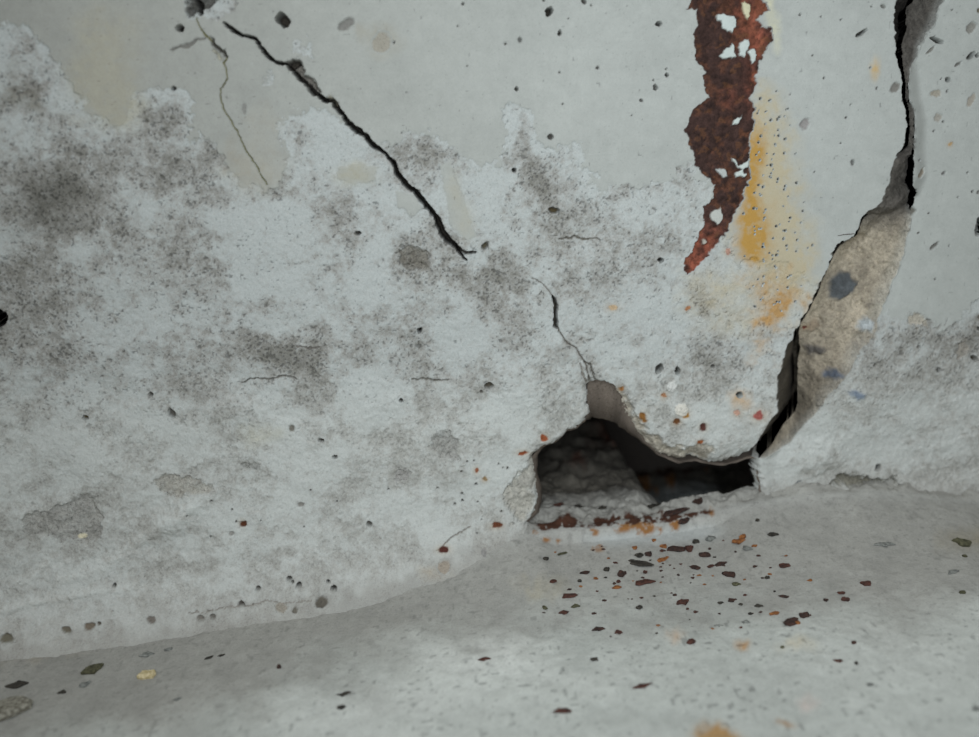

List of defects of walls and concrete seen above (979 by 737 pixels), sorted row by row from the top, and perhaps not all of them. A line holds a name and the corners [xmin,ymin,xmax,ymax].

crack [169,0,477,260]
rust [669,0,828,371]
crack [856,0,945,238]
crack [532,277,597,382]
spalling [615,379,722,461]
rust [723,383,764,421]
rust [530,466,736,578]
rust [558,593,578,615]